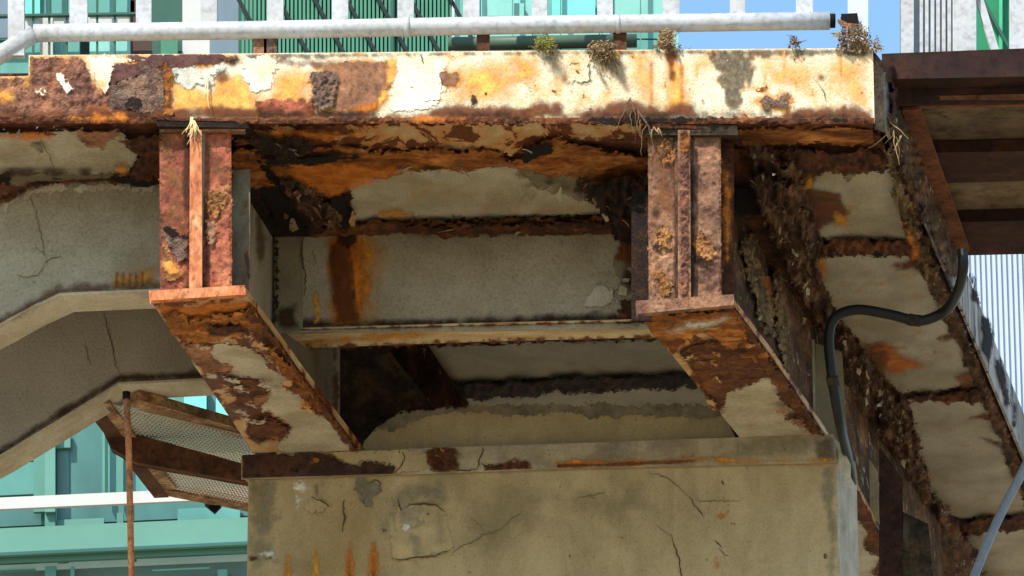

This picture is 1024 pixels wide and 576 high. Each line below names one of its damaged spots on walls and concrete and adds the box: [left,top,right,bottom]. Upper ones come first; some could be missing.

peeling [323,58,397,112]
crack [18,196,60,278]
corrosion [0,51,872,323]
crack [85,316,119,372]
spalling [179,341,433,508]
corrosion [160,235,631,448]
corrosion [426,447,459,472]
crack [649,472,729,515]
corrosion [618,308,821,435]
peeling [680,226,808,411]
peeling [857,491,879,576]
peeling [968,271,1018,432]